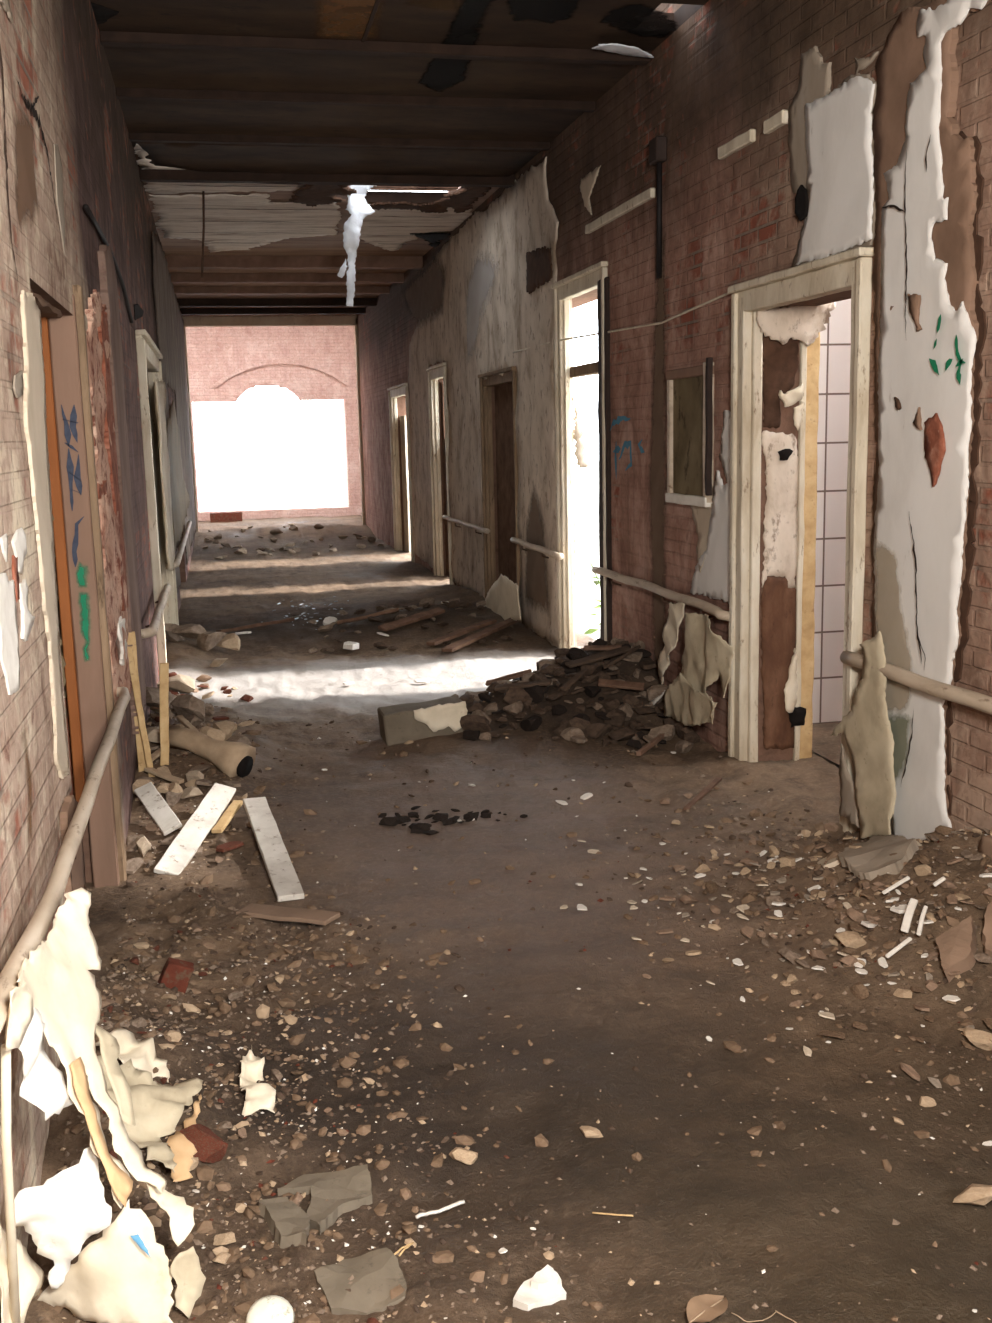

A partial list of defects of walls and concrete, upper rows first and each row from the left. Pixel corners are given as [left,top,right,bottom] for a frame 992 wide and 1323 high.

crack [0,46,60,304]
peeling [0,290,70,779]
spalling [85,144,342,734]
peeling [359,157,559,645]
peeling [788,0,991,840]
peeling [60,795,78,845]
peeling [64,838,86,901]